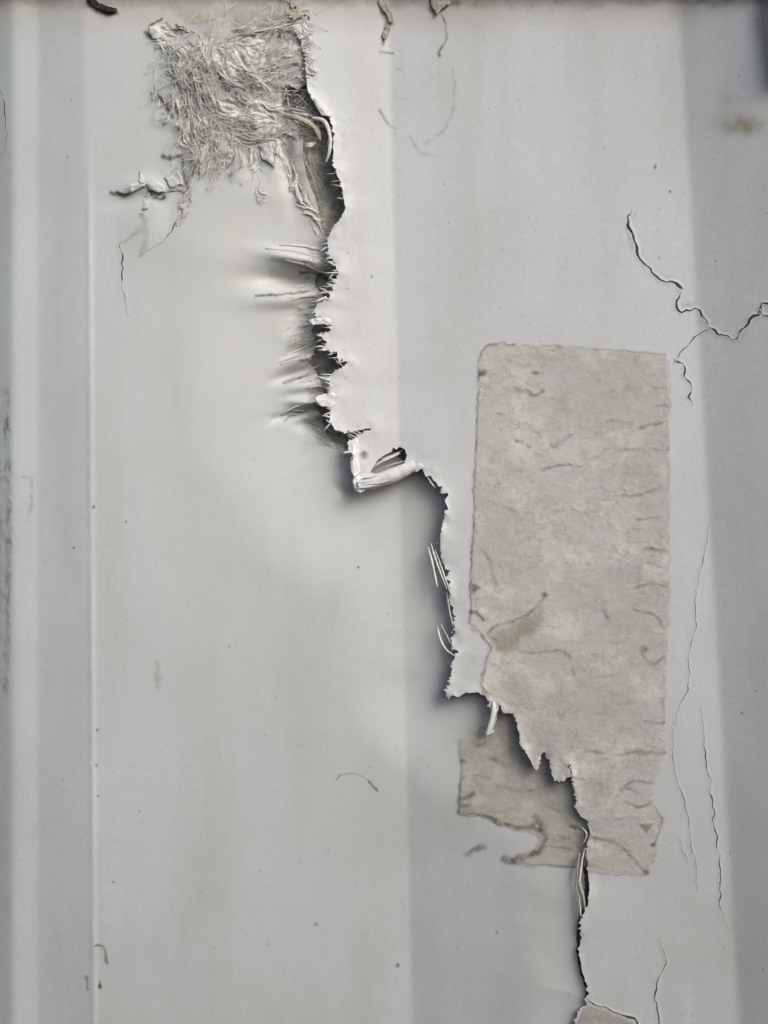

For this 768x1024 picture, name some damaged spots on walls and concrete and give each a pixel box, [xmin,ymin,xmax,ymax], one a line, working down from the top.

peeling [148,17,195,42]
peeling [285,7,309,40]
peeling [309,95,332,117]
crack [623,208,768,405]
crack [669,523,731,932]